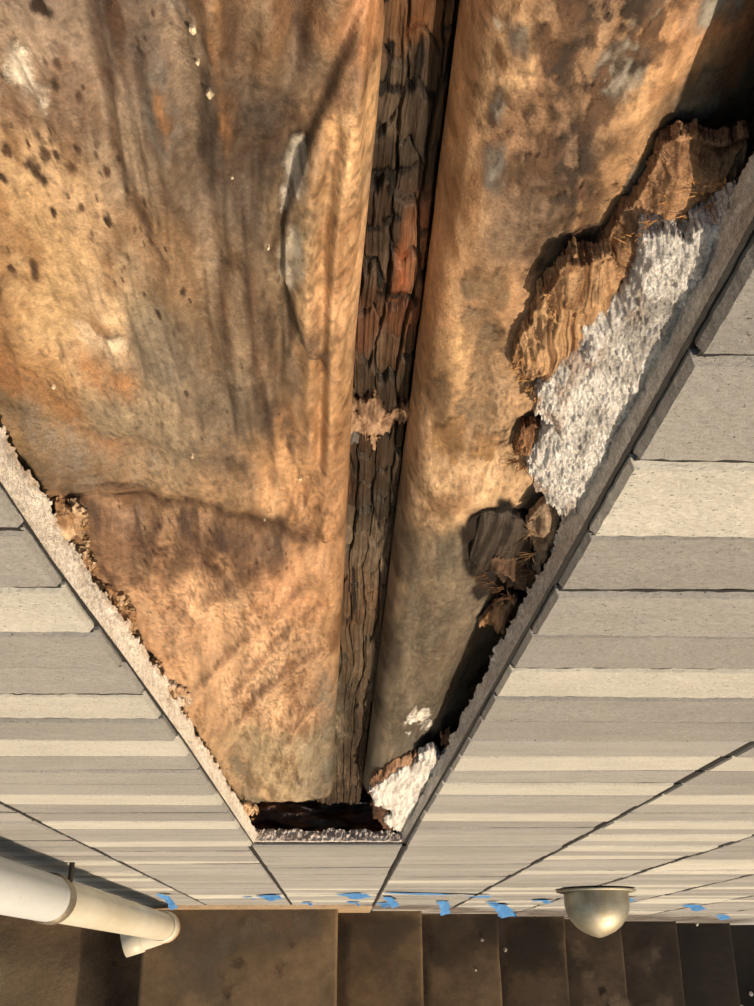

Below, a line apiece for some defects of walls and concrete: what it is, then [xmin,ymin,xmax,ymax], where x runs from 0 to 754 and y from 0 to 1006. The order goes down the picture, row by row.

water stain [100,0,149,63]
peeling [595,19,648,99]
peeling [697,0,744,29]
water stain [25,128,77,187]
peeling [485,143,508,197]
water stain [477,91,538,139]
water stain [498,0,693,271]
peeling [628,158,649,192]
peeling [672,67,728,126]
spalling [526,177,739,525]
water stain [82,483,289,588]
spalling [367,742,448,833]